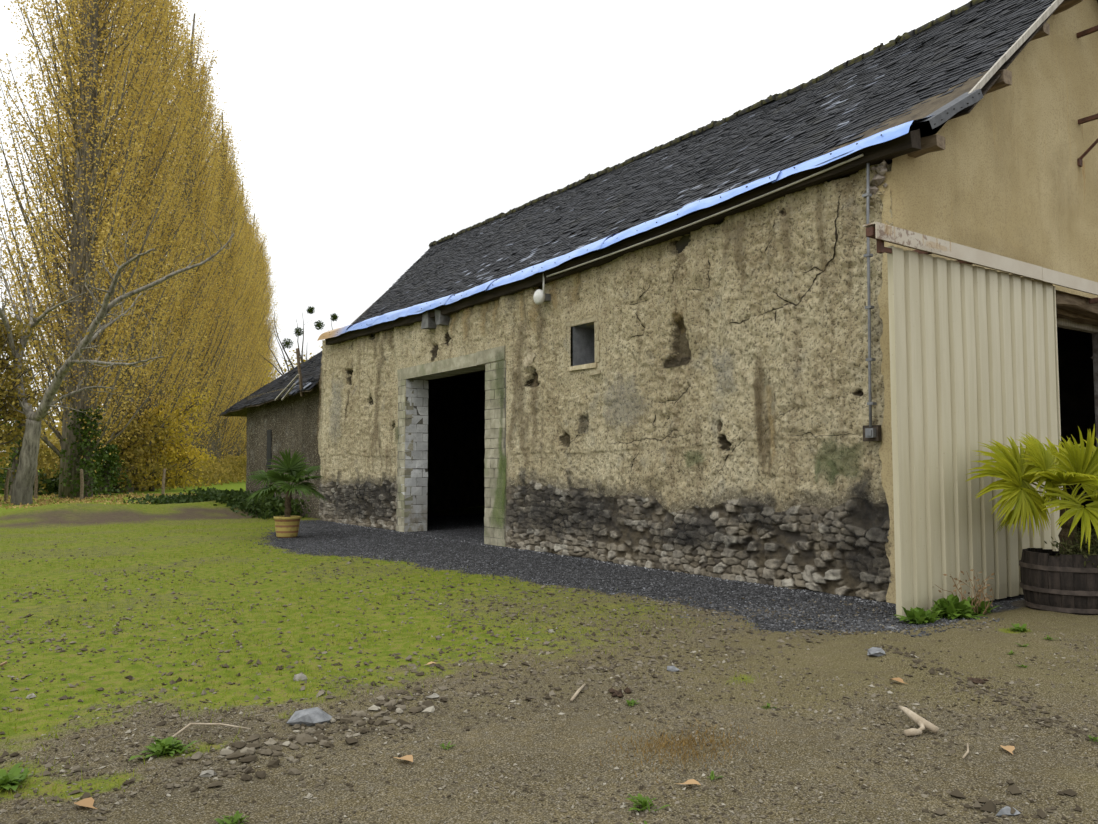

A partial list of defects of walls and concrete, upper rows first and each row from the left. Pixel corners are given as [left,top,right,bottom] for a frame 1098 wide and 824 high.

crack [729,192,844,324]
peeling [521,346,540,390]
spalling [663,314,692,369]
spalling [717,421,733,456]